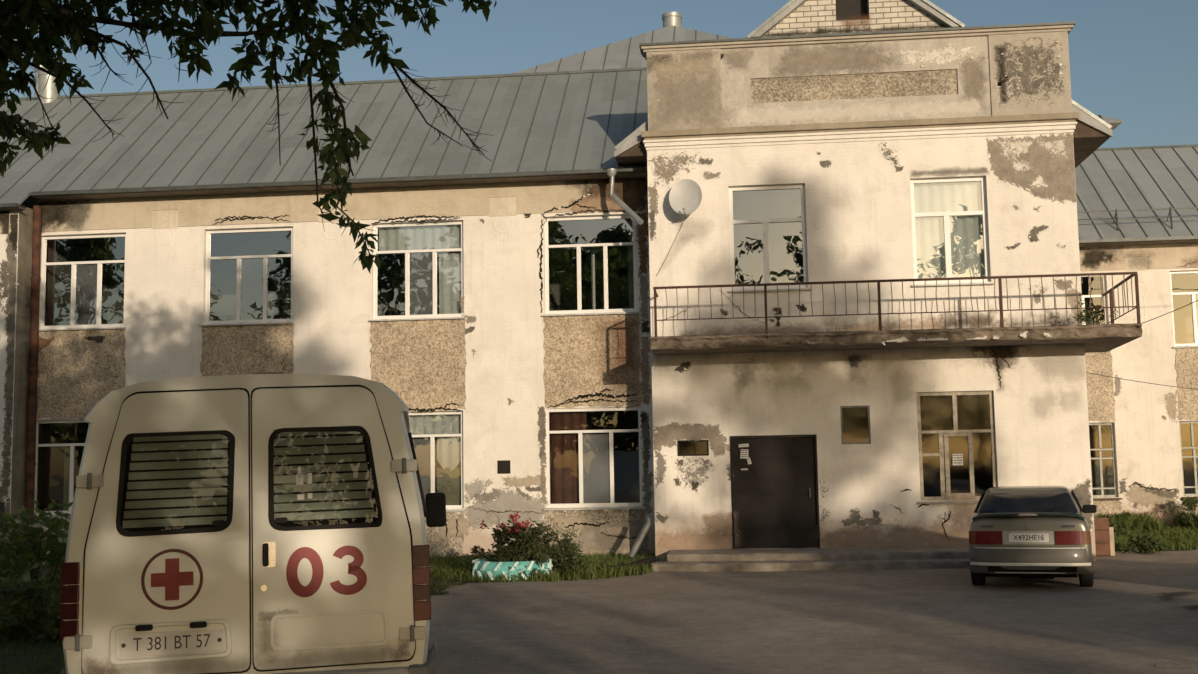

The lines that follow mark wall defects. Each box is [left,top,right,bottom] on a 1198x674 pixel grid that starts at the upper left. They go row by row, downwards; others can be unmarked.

peeling [879,37,1069,107]
peeling [879,142,903,172]
flaking render [986,133,1076,250]
crack [213,215,290,225]
crack [537,192,626,313]
flaking render [769,304,807,326]
peeling [0,214,19,532]
peeling [438,149,734,559]
crack [547,388,639,408]
damp [973,346,1019,368]
flaking render [819,481,903,532]
flaking render [1119,478,1185,510]